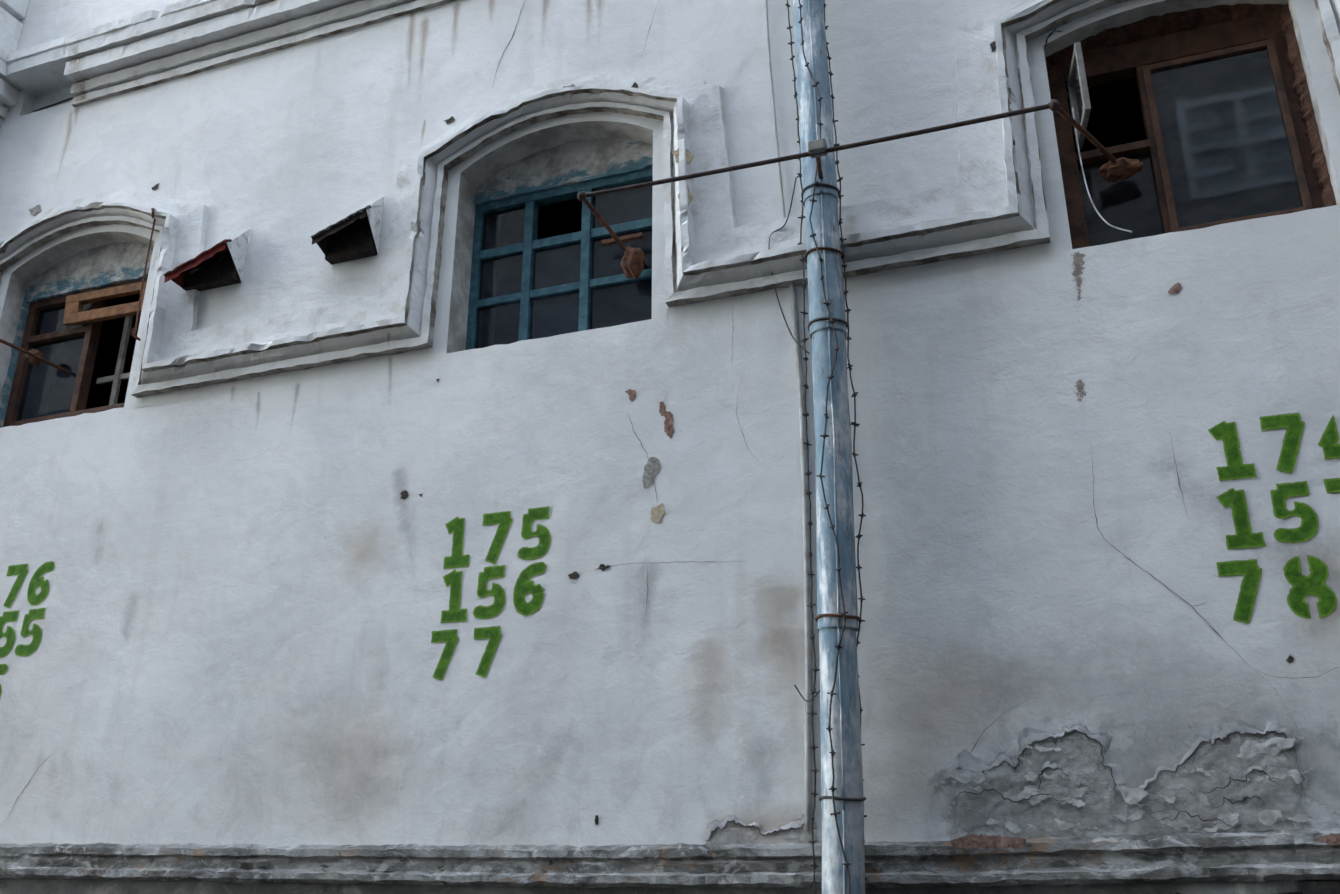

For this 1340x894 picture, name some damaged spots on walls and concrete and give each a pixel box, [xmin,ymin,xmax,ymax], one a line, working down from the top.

spalling [659,402,674,438]
spalling [642,457,660,489]
spalling [651,503,665,522]
crack [1091,447,1339,786]
spalling [927,716,1340,850]
spalling [702,813,817,845]